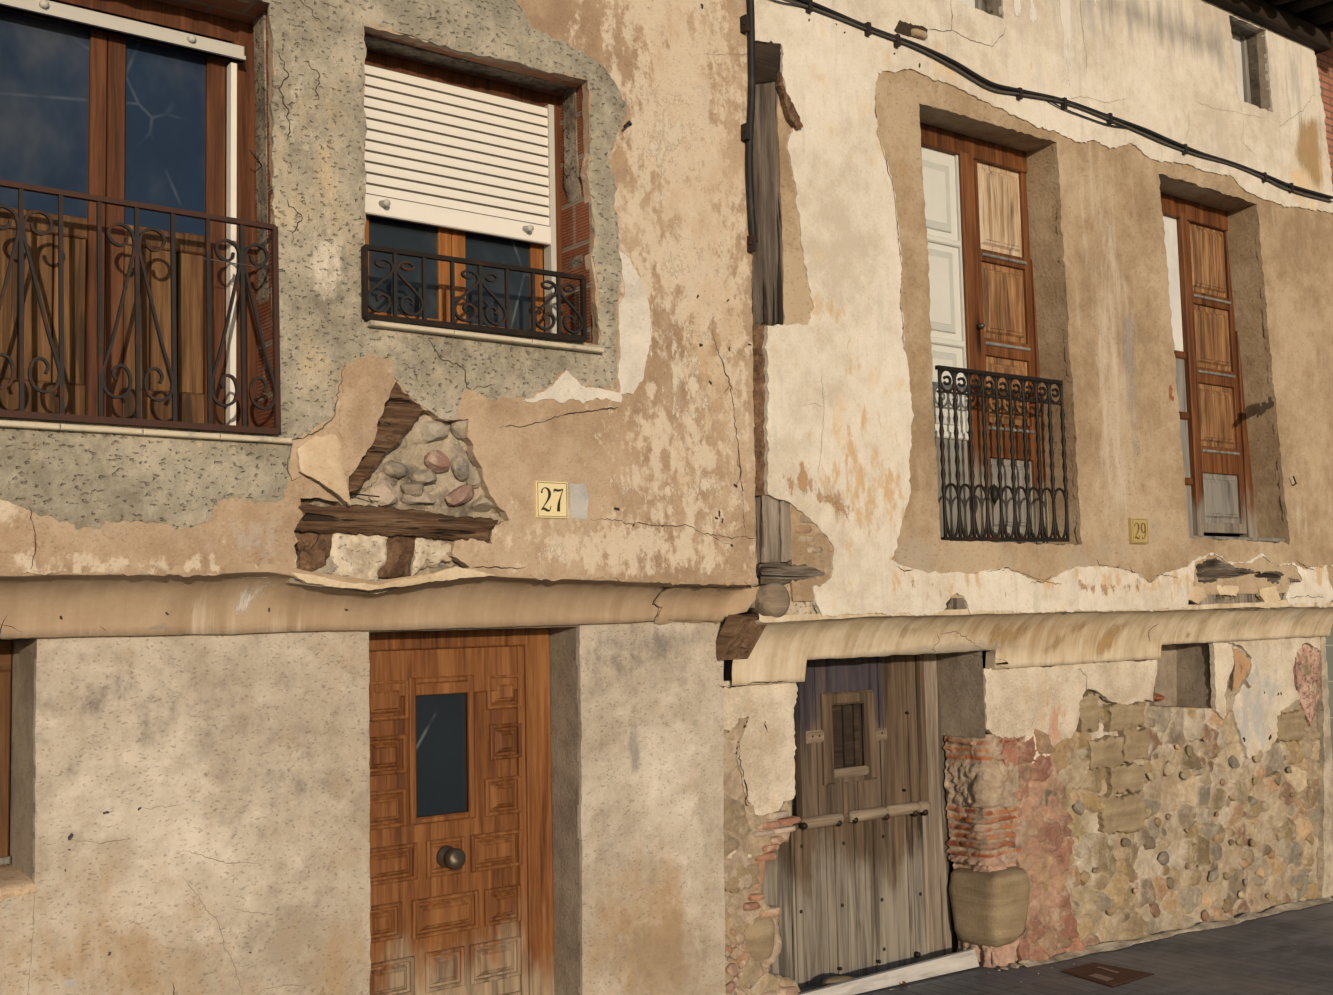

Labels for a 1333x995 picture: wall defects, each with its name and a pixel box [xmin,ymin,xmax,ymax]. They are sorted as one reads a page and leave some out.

leakage [1298,121,1320,184]
spalling [716,42,847,660]
spalling [1256,396,1274,418]
spalling [285,384,504,594]
spalling [944,598,966,610]
peeling [1079,580,1139,595]
spalling [1188,557,1301,611]
crack [180,850,310,995]
spalling [723,717,801,995]
spalling [943,642,1322,968]